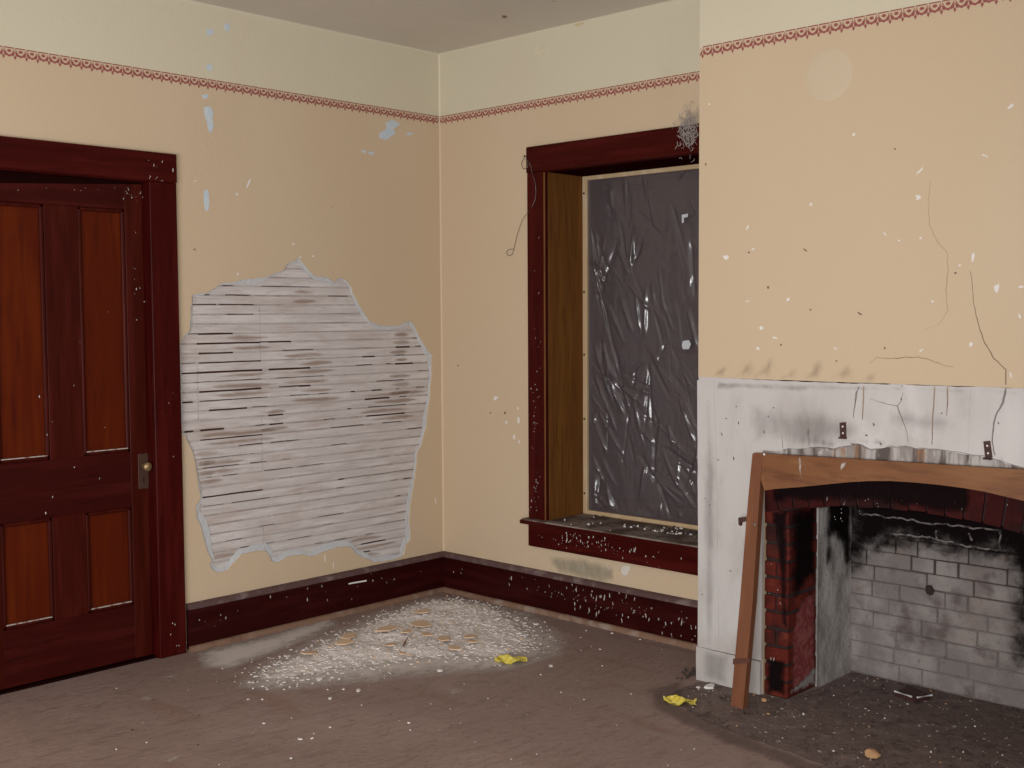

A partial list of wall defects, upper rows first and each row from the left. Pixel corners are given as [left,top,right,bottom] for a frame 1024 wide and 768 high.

peeling [202,94,214,132]
peeling [379,120,413,140]
spalling [180,255,432,573]
crack [810,186,1024,468]